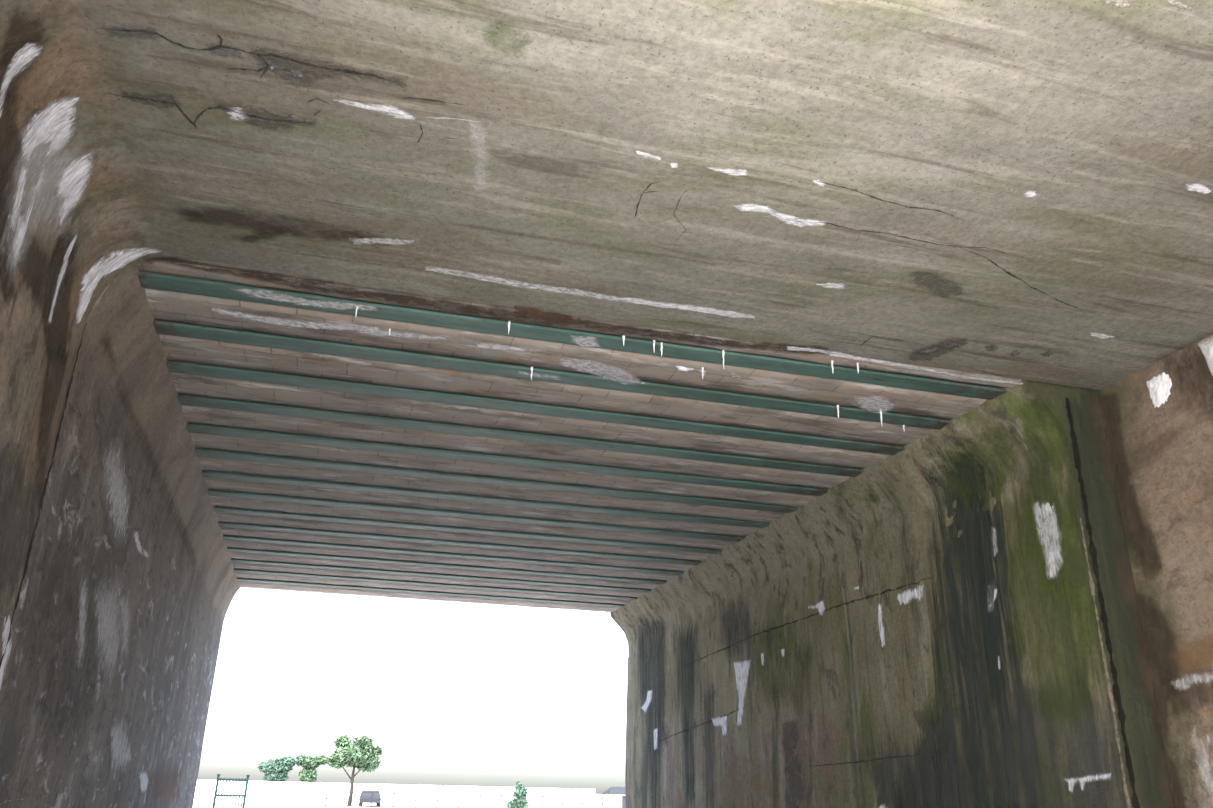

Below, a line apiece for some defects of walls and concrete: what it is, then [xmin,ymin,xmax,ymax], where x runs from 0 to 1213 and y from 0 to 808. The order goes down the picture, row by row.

crack [99,28,477,143]
crack [783,182,1098,315]
leakage [0,16,1023,598]
leakage [1146,348,1213,408]
leakage [0,615,12,689]
leakage [111,721,130,769]
leakage [140,772,148,792]
leakage [638,607,764,808]
crack [657,706,746,743]
crack [687,577,933,665]
leakage [871,452,1126,808]
leakage [1090,396,1207,808]